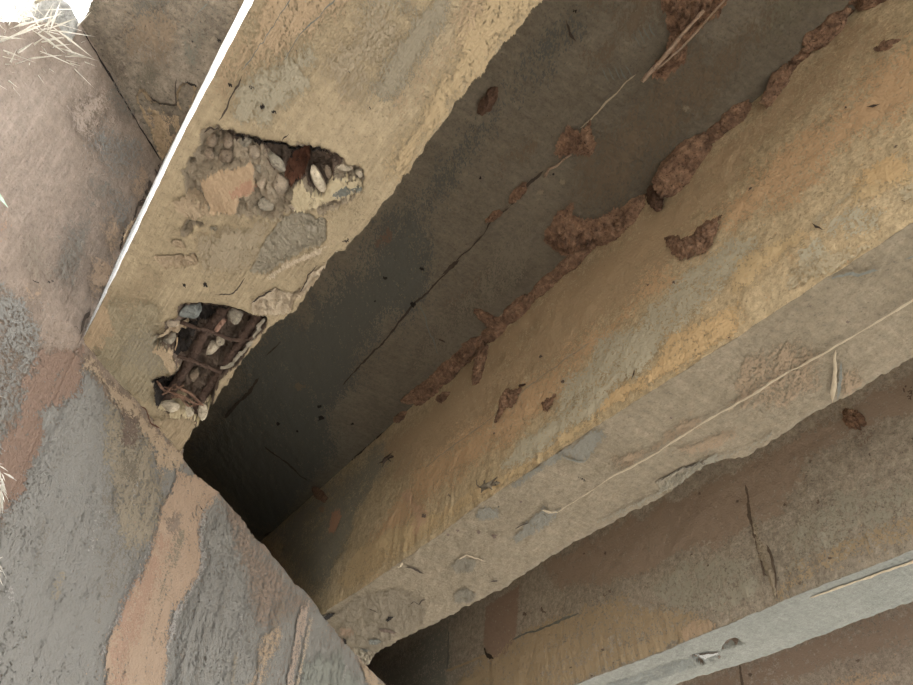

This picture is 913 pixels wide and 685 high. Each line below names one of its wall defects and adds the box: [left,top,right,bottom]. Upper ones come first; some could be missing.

spalling [152,125,364,427]
crack [343,171,543,385]
crack [745,485,778,599]